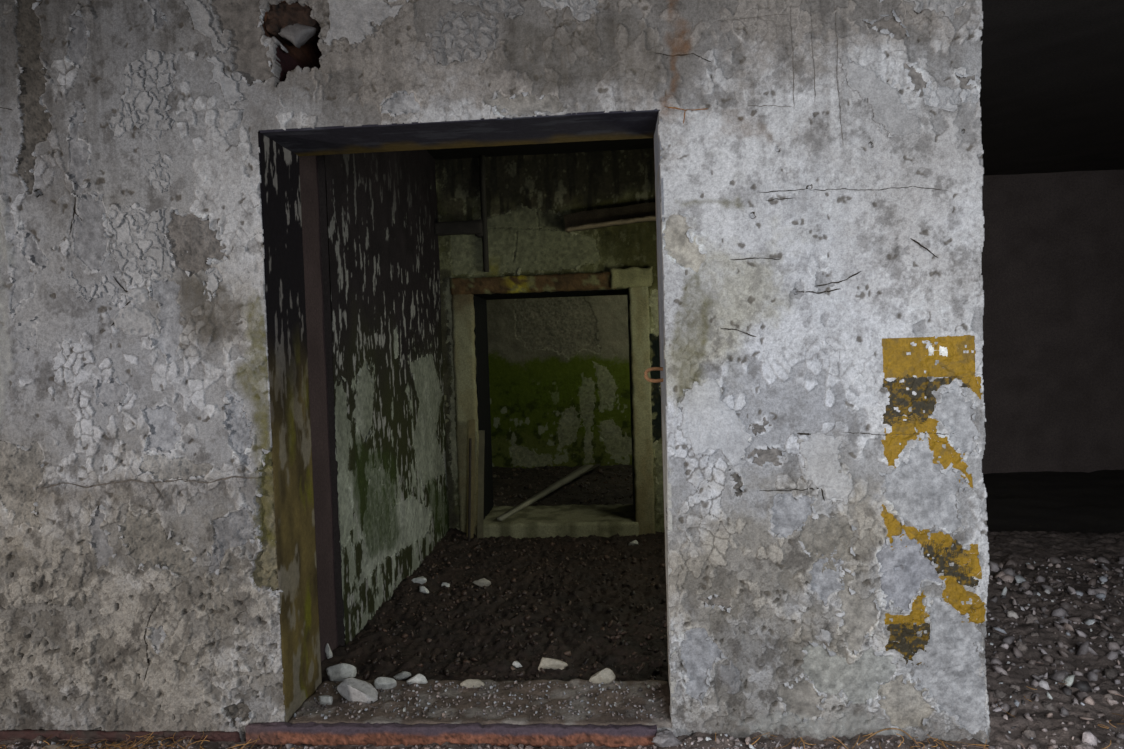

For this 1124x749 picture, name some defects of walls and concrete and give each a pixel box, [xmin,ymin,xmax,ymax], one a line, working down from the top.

spalling [13,0,52,197]
peeling [109,48,176,194]
spalling [180,0,409,105]
peeling [23,231,49,270]
peeling [68,206,228,363]
peeling [925,340,948,357]
spalling [0,441,44,530]
peeling [677,379,988,736]